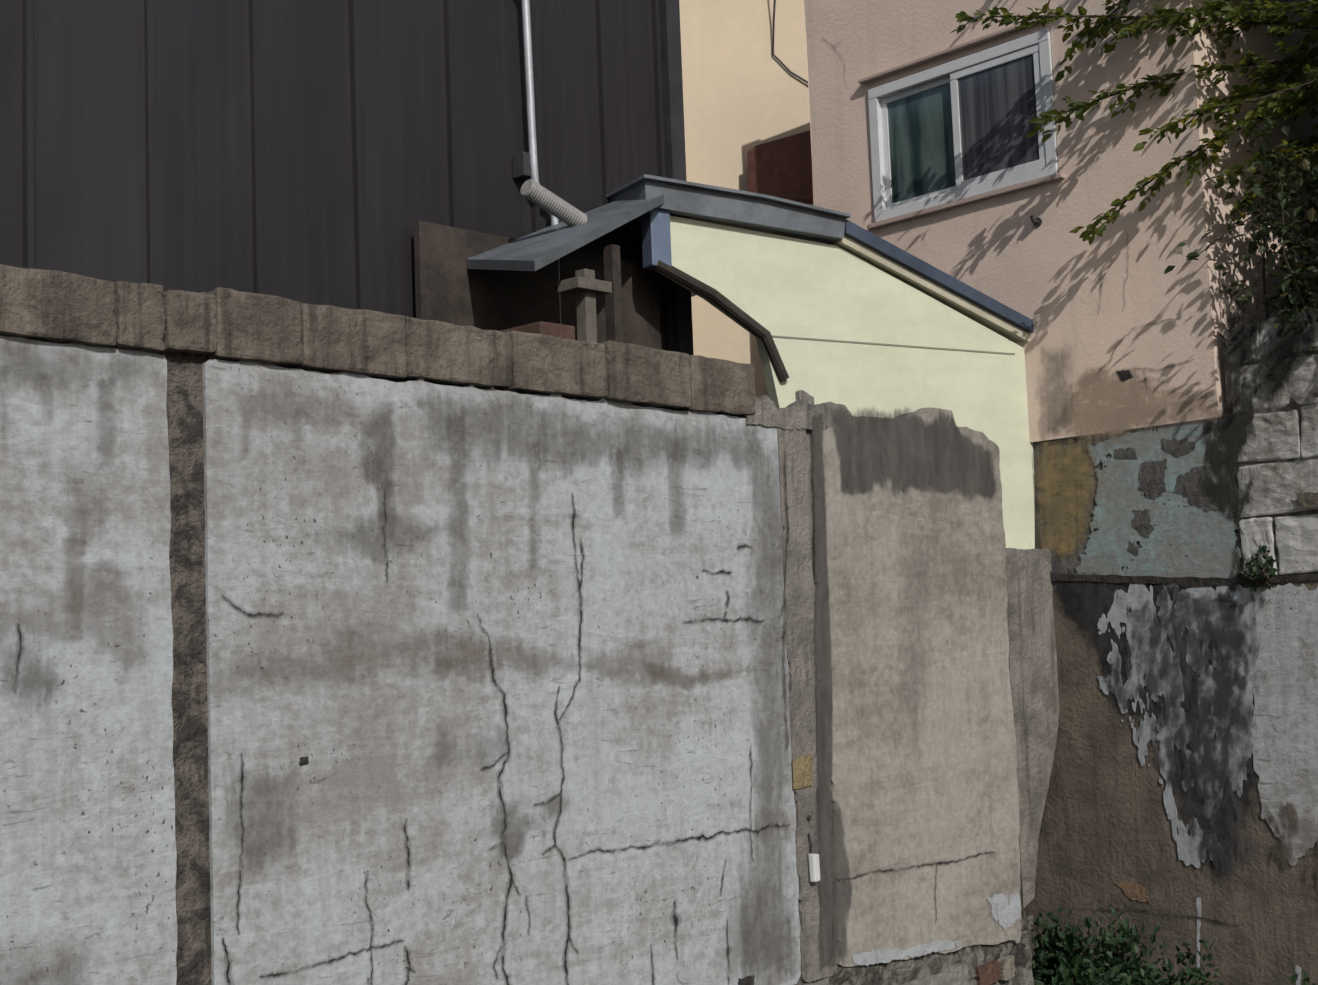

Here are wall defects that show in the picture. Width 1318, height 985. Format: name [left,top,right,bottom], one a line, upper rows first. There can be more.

water stain [1056,369,1219,439]
water stain [366,412,394,488]
crack [15,623,23,676]
crack [222,595,284,616]
peeling [1076,417,1318,868]
crack [478,454,791,985]
crack [222,753,415,985]
crack [835,852,995,925]